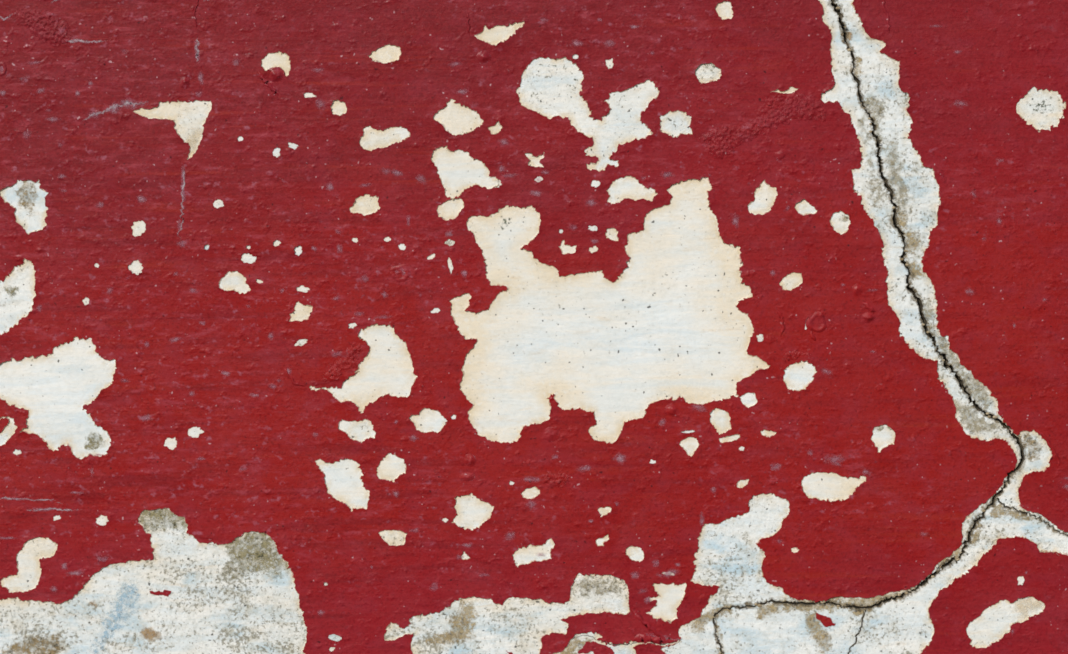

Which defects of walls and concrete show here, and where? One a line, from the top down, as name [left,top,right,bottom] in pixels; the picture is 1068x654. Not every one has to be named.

peeling [132,100,212,160]
peeling [0,179,48,235]
peeling [0,258,36,335]
peeling [0,336,117,459]
peeling [310,323,417,443]
peeling [384,0,1068,654]
crack [712,0,1068,654]
peeling [0,508,307,654]
peeling [379,530,407,546]